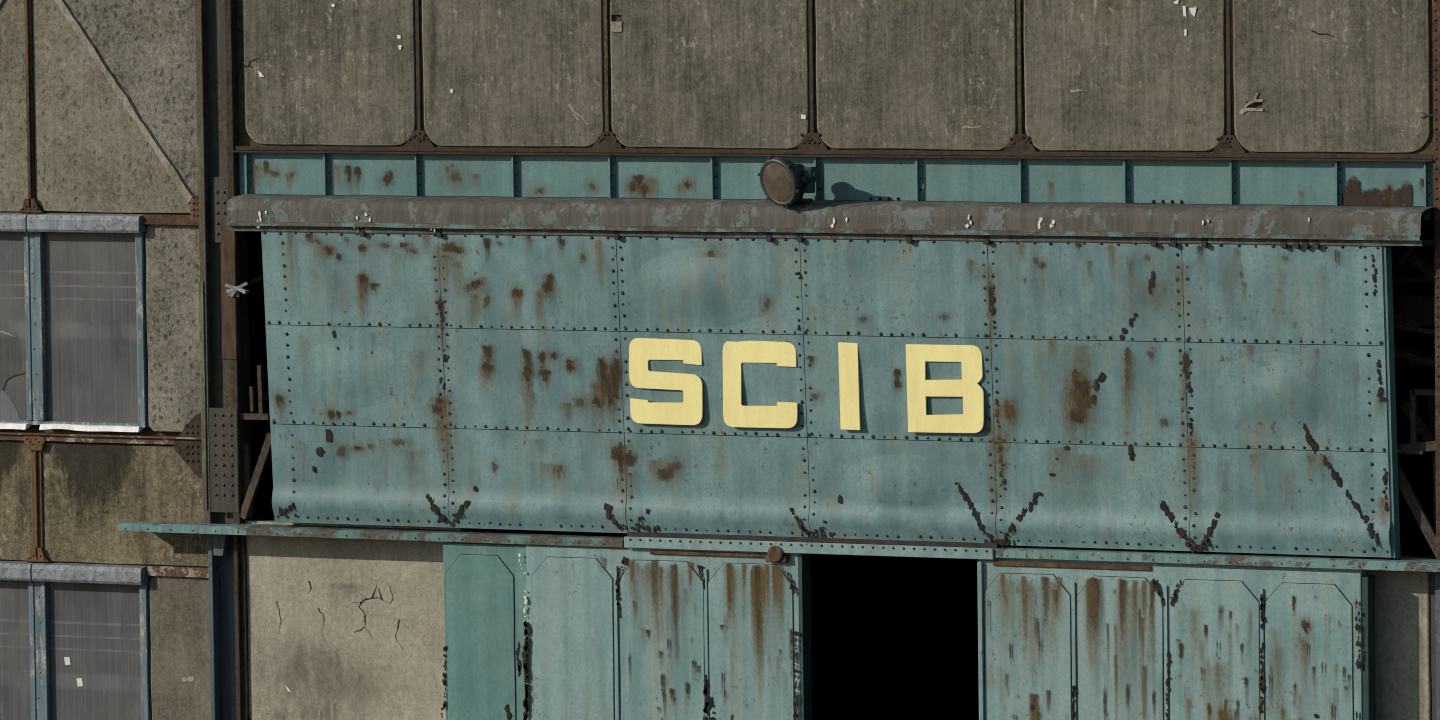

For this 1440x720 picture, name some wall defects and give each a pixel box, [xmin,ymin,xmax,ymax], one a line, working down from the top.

rust [521,348,575,397]
rust [564,355,622,411]
damp [0,440,24,490]
damp [52,441,136,519]
crack [308,581,403,651]
rust [651,560,699,710]
rust [726,563,781,648]
rust [987,574,1059,651]
rust [1086,577,1155,720]
rust [1292,596,1327,674]
rust [1013,690,1050,720]
rust [1207,677,1247,720]